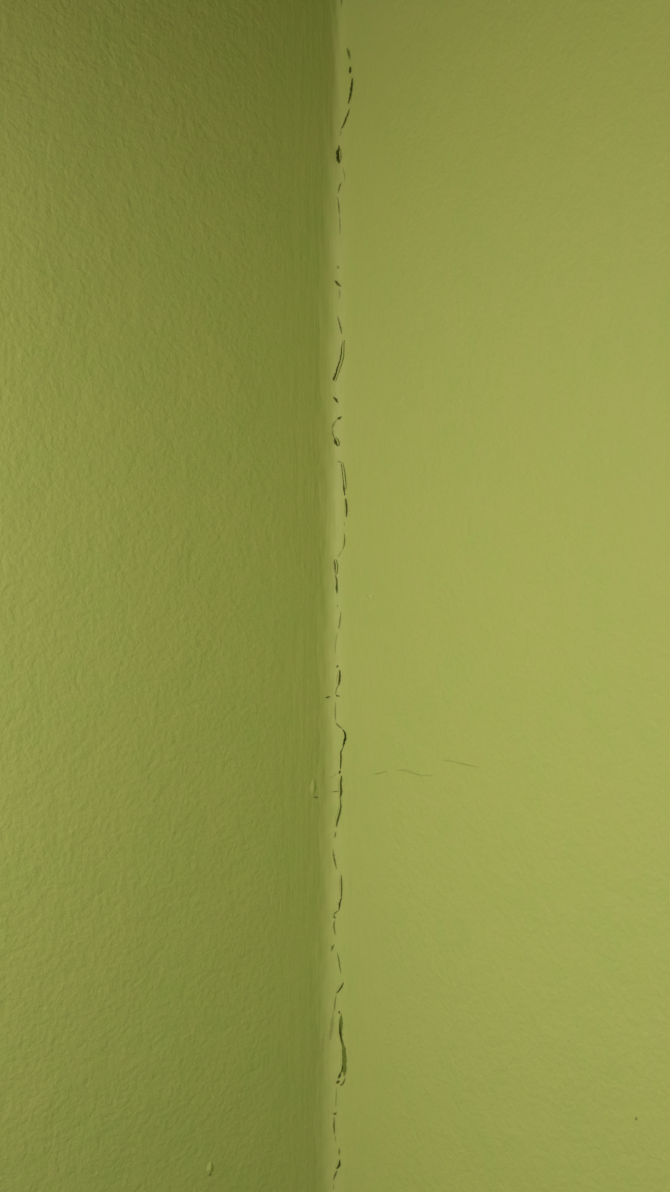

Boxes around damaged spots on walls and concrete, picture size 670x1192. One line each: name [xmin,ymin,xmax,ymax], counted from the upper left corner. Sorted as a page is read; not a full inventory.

crack [341,49,352,129]
crack [332,319,347,628]
crack [326,665,346,1009]
crack [332,1112,340,1180]